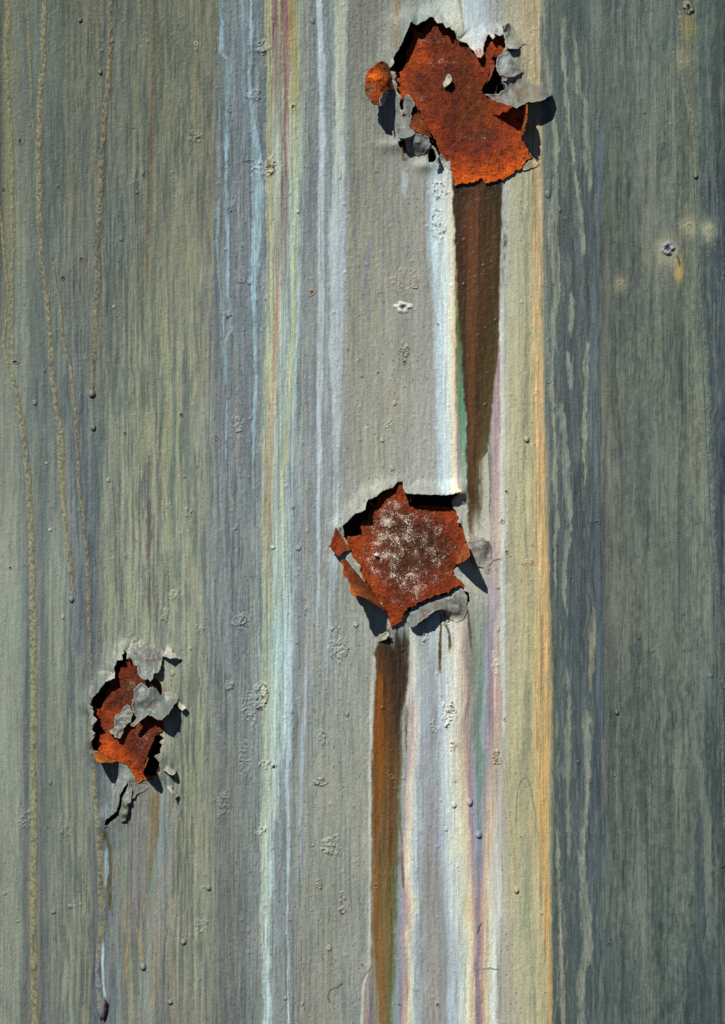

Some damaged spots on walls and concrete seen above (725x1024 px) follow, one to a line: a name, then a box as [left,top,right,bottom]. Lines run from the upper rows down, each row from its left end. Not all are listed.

corrosion [391,0,401,51]
peeling [365,16,551,186]
corrosion [450,172,509,545]
peeling [329,481,509,643]
peeling [87,633,186,799]
corrosion [371,623,411,1024]